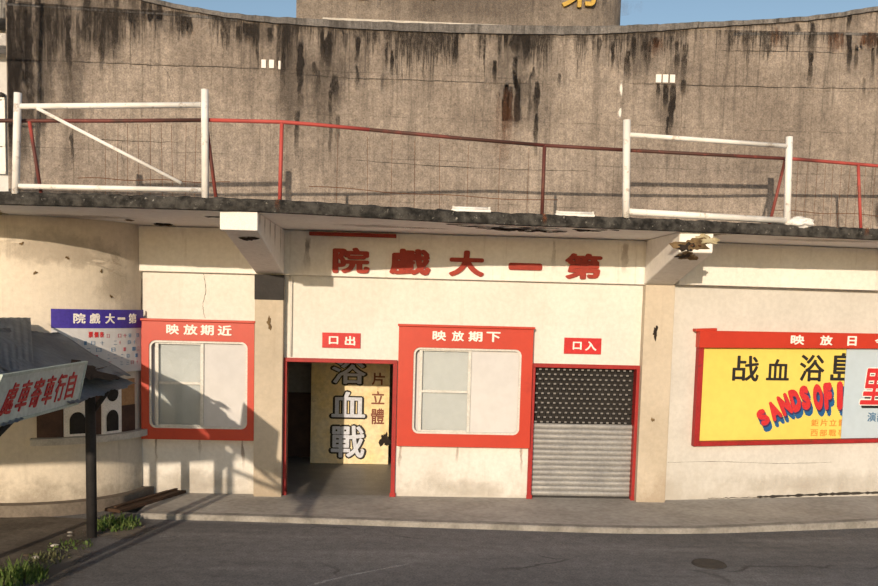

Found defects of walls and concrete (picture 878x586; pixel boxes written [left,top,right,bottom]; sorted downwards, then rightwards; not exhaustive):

damp [6,0,465,146]
damp [479,34,550,105]
damp [575,30,689,70]
damp [719,15,878,75]
damp [656,81,686,130]
peeling [447,224,619,233]